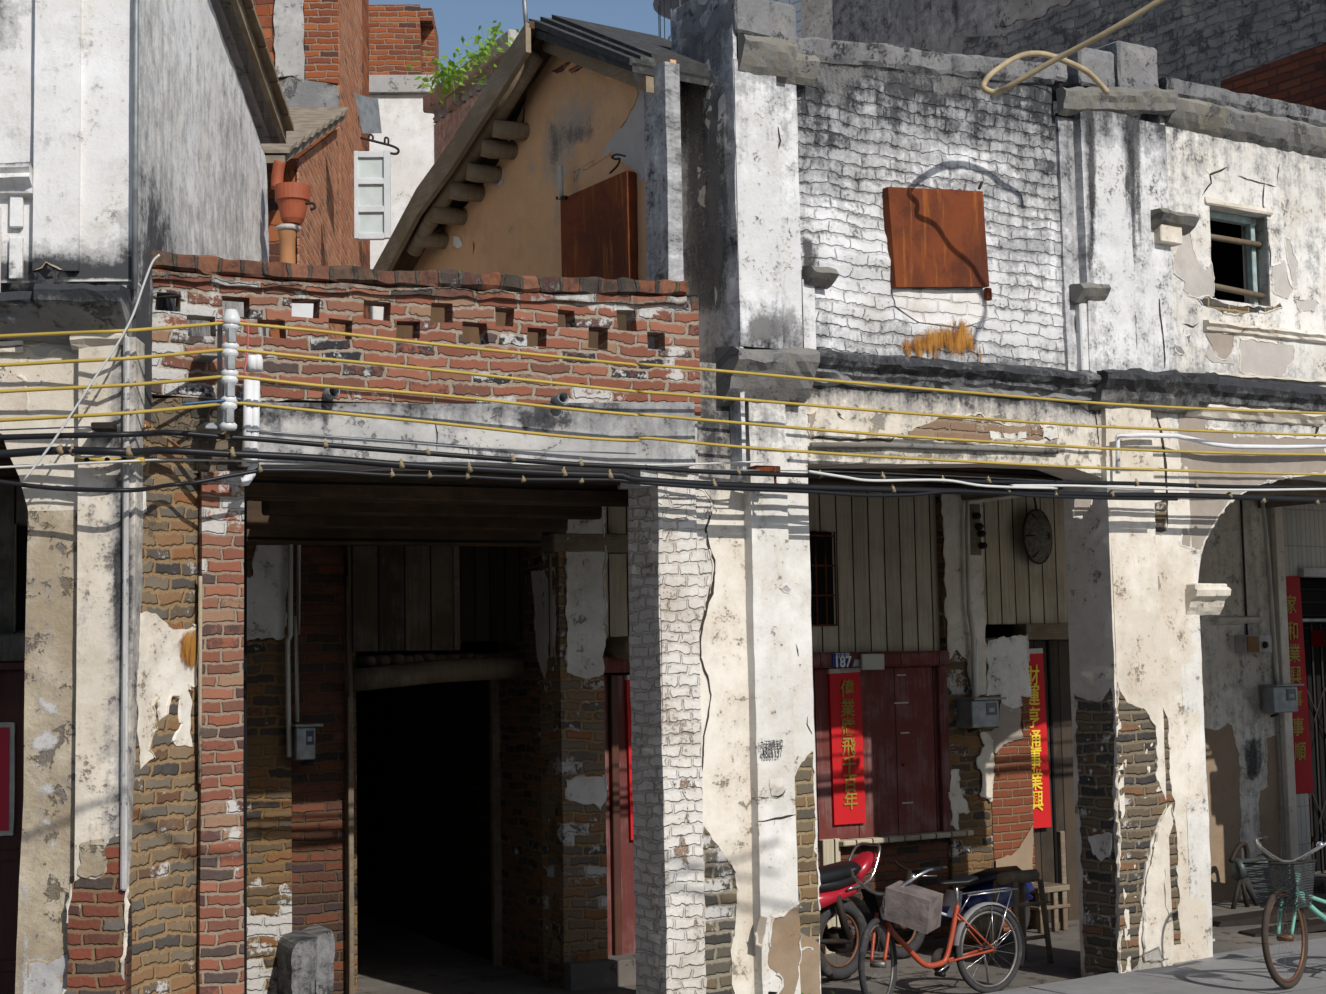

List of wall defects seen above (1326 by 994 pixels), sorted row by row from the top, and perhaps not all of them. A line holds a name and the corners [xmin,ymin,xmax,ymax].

damp [816,63,969,103]
peeling [1172,232,1319,317]
rust [901,321,981,362]
peeling [1175,332,1295,377]
peeling [160,624,198,742]
crack [696,489,717,771]
flaking render [948,695,1032,826]
flaking render [23,834,130,994]
flaking render [703,827,739,994]
flaking render [754,751,821,994]
flaking render [1074,682,1181,974]